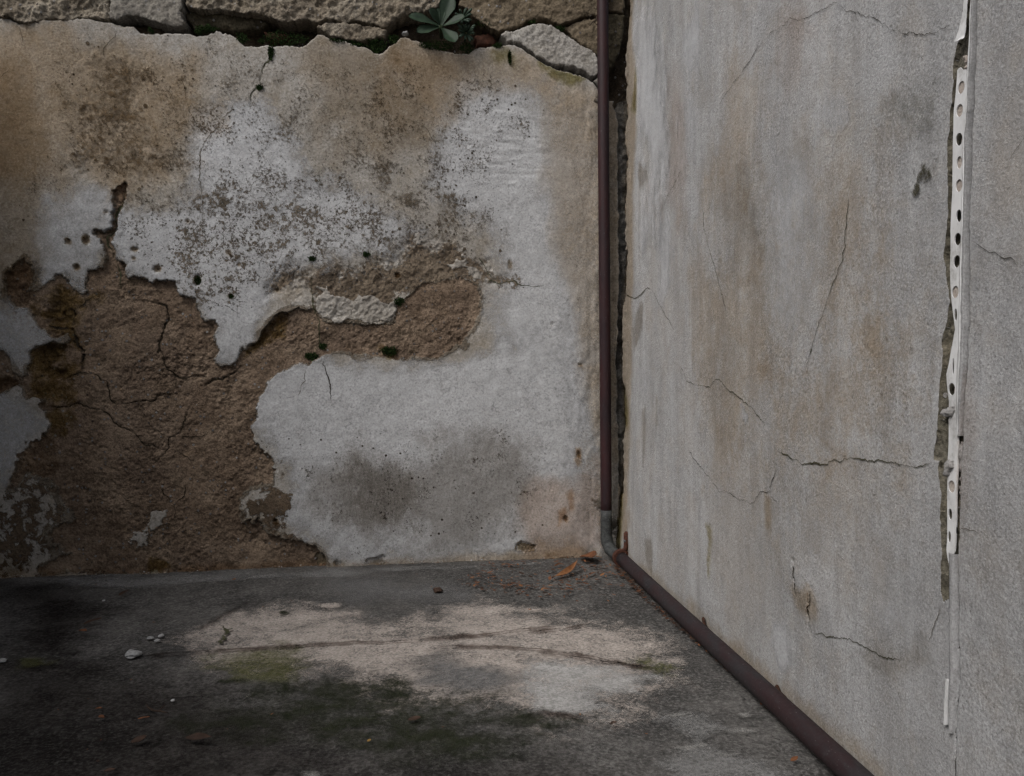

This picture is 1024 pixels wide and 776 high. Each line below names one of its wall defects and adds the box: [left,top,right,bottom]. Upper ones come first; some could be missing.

crack [370,3,500,55]
crack [103,25,317,238]
leakage [34,100,410,363]
crack [479,258,546,287]
flaking render [0,36,536,578]
leakage [252,75,612,577]
crack [49,296,240,460]
crack [681,368,762,421]
crack [690,452,930,503]
leakage [49,570,281,588]
crack [812,632,900,660]